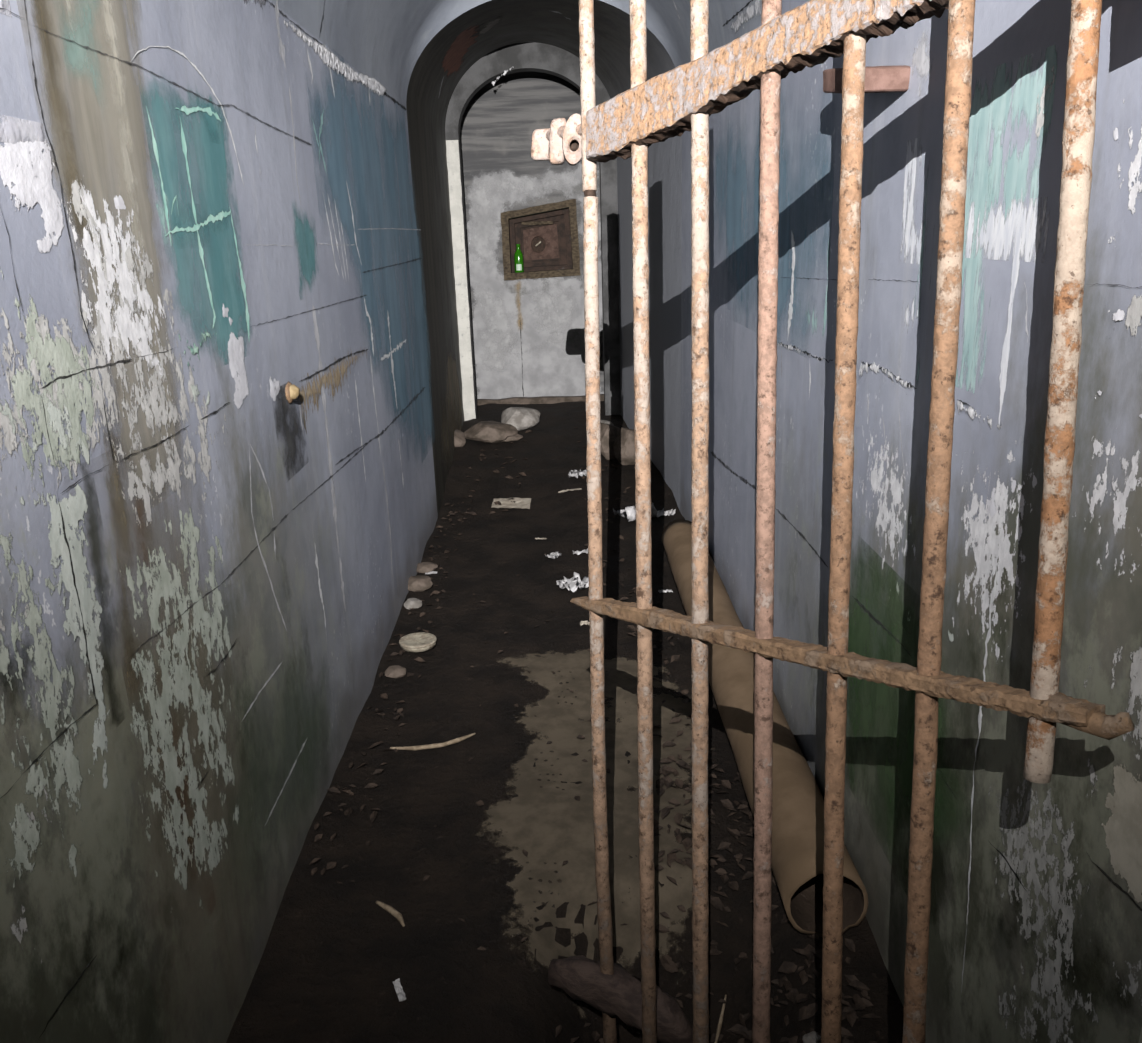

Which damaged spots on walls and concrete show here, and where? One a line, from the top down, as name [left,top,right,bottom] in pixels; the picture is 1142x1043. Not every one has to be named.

crack [723,0,753,26]
leakage [104,642,137,722]
peeling [0,140,252,892]
leakage [35,0,250,566]
crack [0,0,312,798]
leakage [156,542,235,987]
leakage [244,0,432,611]
leakage [446,353,462,434]
peeling [856,428,917,569]
peeling [948,440,1037,662]
peeling [988,646,1142,1043]
peeling [1075,428,1142,582]